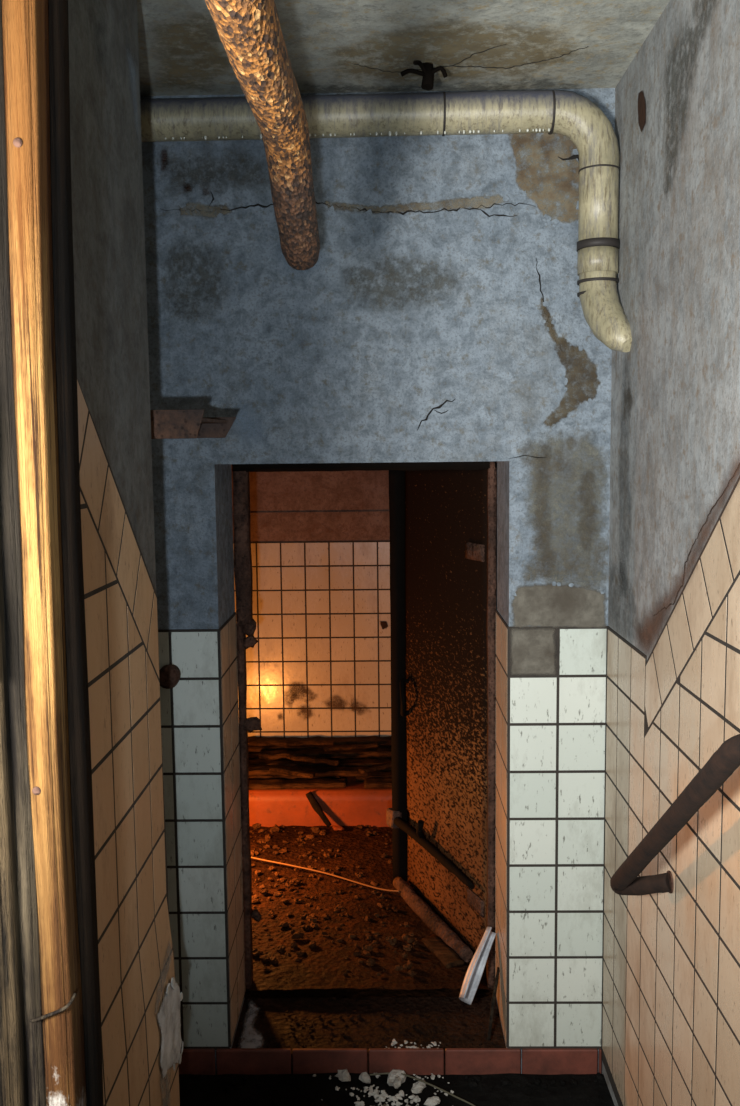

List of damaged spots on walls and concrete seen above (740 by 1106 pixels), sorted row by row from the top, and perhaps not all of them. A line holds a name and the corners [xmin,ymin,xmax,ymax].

crack [162,191,273,212]
crack [316,202,535,217]
spalling [323,133,579,225]
peeling [536,259,601,428]
crack [417,399,455,430]
damp [524,437,608,589]
spalling [155,946,184,1078]